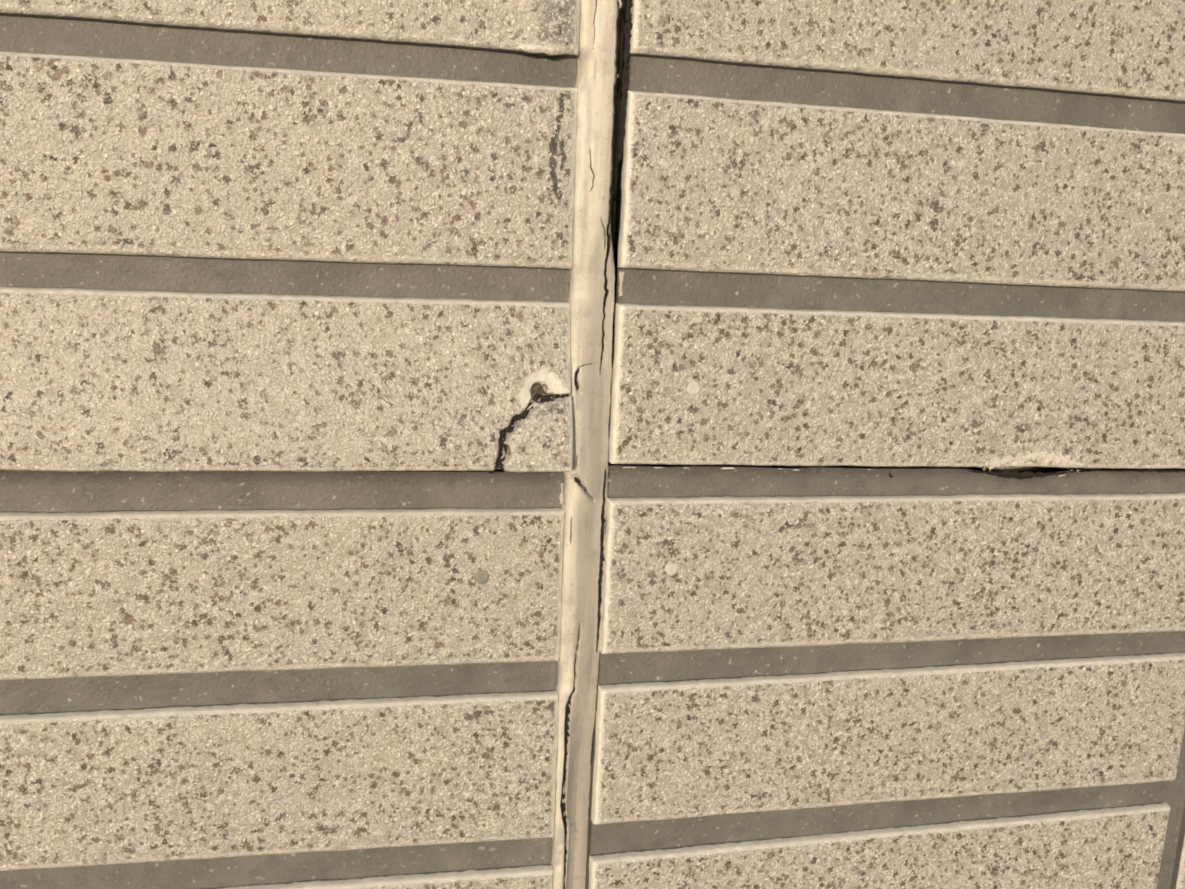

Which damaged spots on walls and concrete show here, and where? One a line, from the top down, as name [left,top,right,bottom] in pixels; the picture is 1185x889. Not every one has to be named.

crack [588,150,596,191]
crack [487,363,594,474]
crack [570,457,593,544]
crack [560,631,579,889]